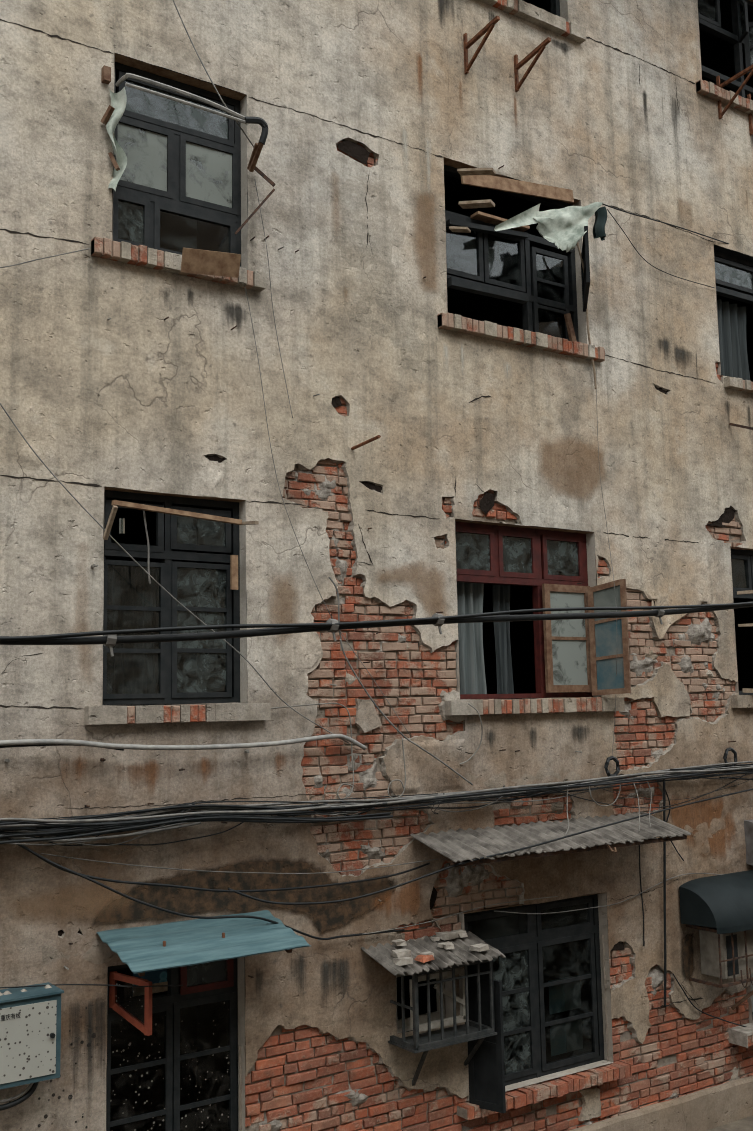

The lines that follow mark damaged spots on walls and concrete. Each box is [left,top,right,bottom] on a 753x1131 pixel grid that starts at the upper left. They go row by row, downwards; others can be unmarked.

crack [0,19,113,54]
flaking render [441,489,522,525]
flaking render [705,506,748,550]
flaking render [282,458,465,877]
flaking render [613,588,737,816]
flaking render [465,766,604,827]
flaking render [391,858,525,943]
flaking render [239,934,753,1131]